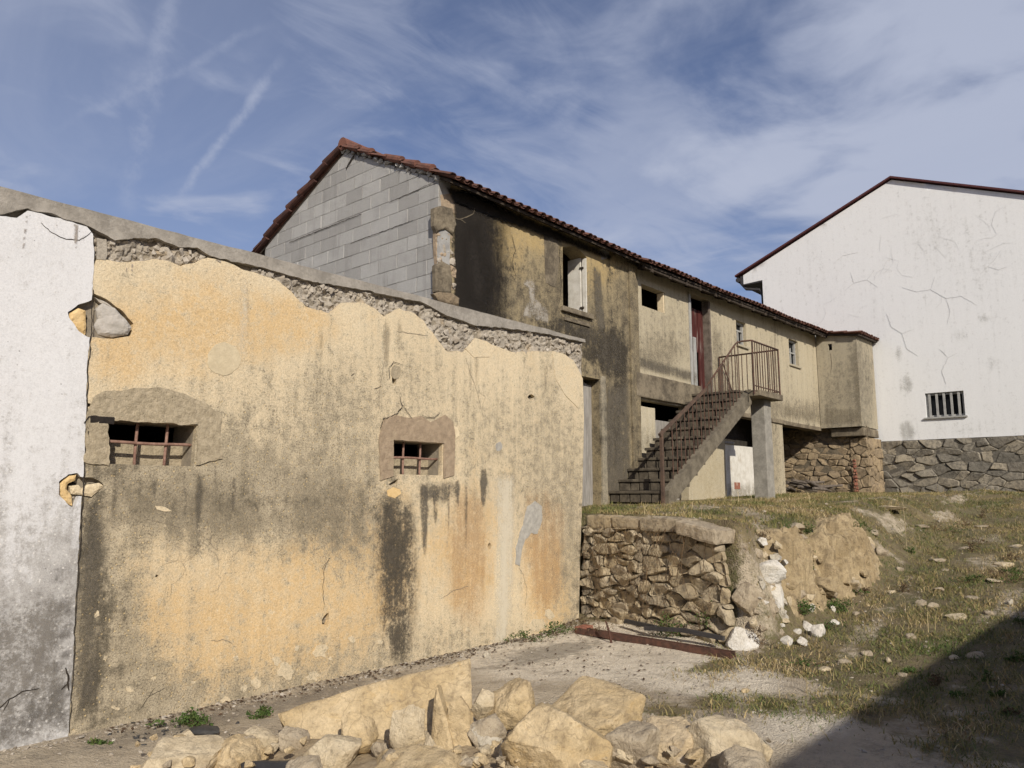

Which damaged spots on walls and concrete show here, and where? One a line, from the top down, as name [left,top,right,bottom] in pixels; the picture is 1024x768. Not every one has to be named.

spalling [68,297,131,338]
spalling [90,230,224,266]
spalling [250,194,582,408]
damp [560,267,624,374]
spalling [59,475,103,506]
damp [606,386,630,492]
damp [81,508,102,703]
damp [378,482,467,662]